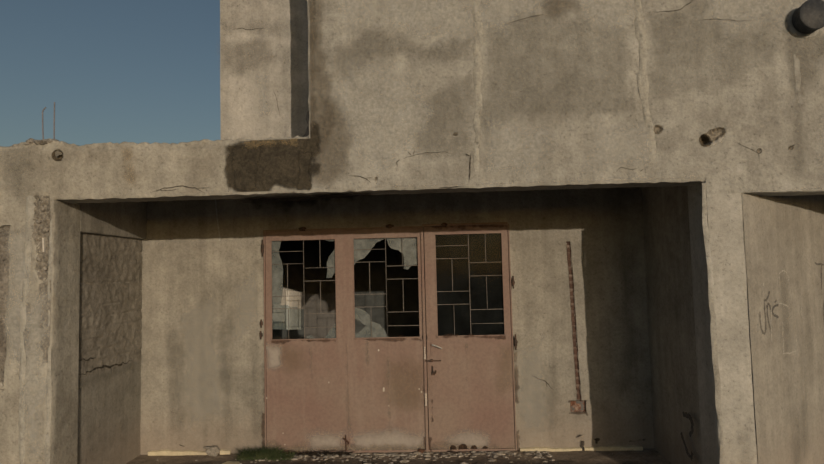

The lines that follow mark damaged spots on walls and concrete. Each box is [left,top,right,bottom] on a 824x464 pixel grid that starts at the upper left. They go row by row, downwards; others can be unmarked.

leakage [225,83,371,207]
crack [396,151,471,188]
spalling [699,127,725,147]
spalling [0,226,10,382]
spalling [18,195,51,361]